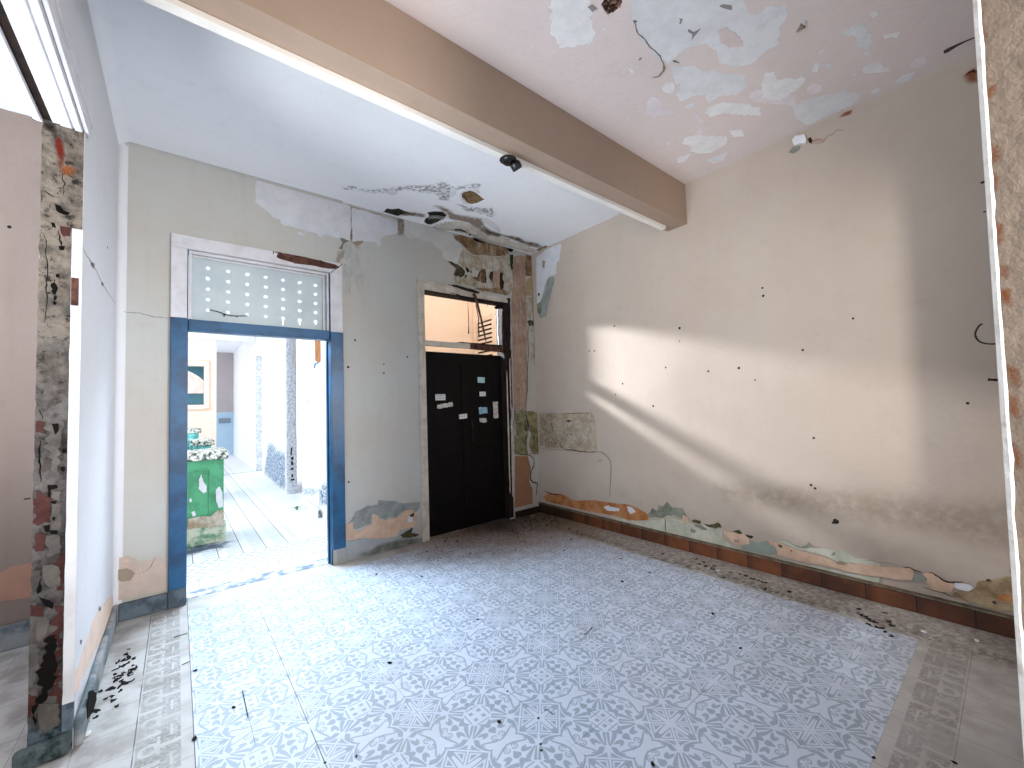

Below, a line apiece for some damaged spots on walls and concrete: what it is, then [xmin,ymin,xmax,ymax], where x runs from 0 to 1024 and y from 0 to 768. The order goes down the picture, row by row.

crack [633,20,679,78]
peeling [549,0,880,164]
spalling [51,204,71,250]
spalling [51,274,60,305]
crack [44,231,169,322]
peeling [255,180,561,410]
crack [36,410,44,481]
spalling [0,421,168,733]
spalling [337,500,422,563]
spalling [515,456,1014,611]